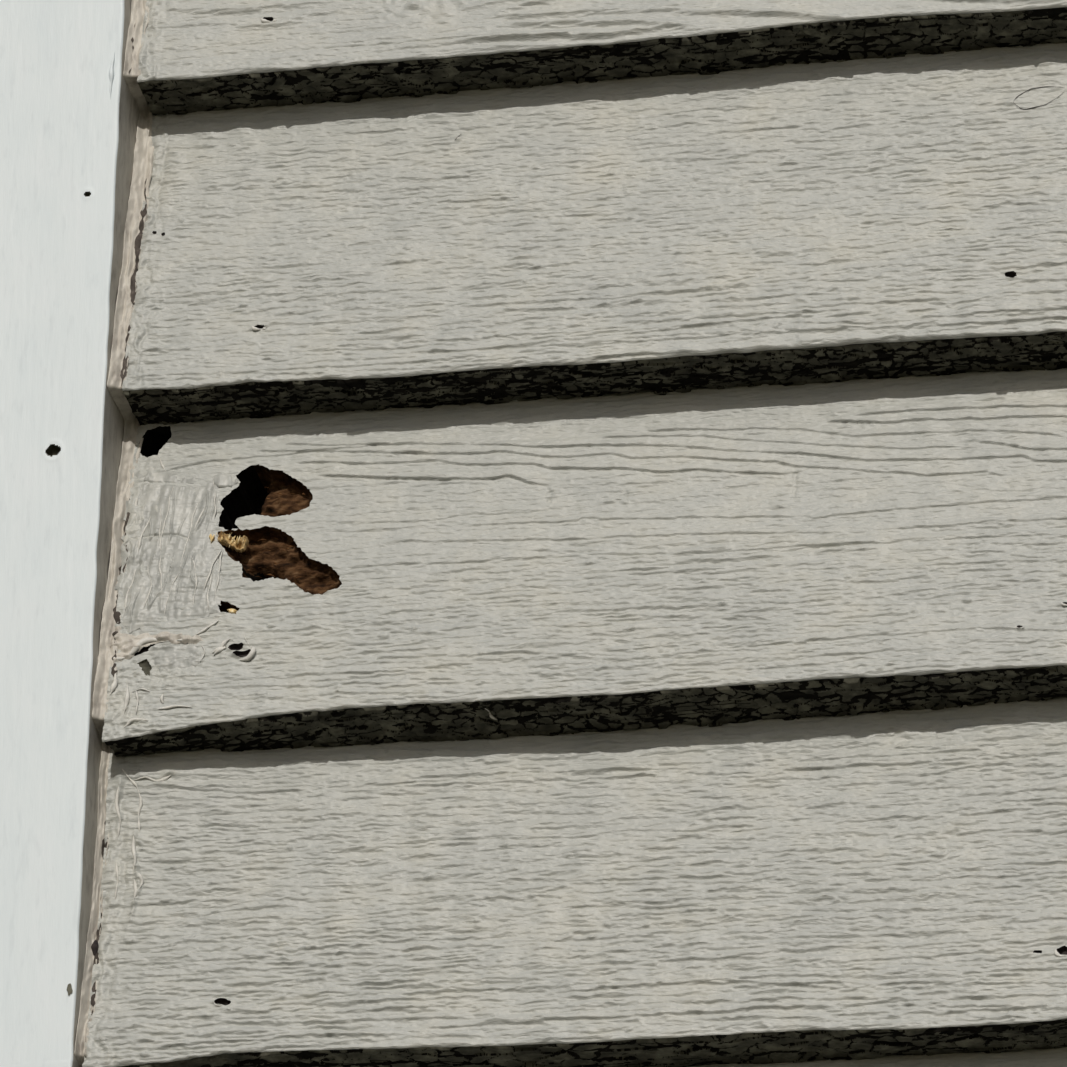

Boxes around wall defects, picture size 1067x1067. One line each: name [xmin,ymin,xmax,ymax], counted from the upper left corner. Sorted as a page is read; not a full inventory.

spalling [218,464,342,595]
peeling [110,620,256,727]